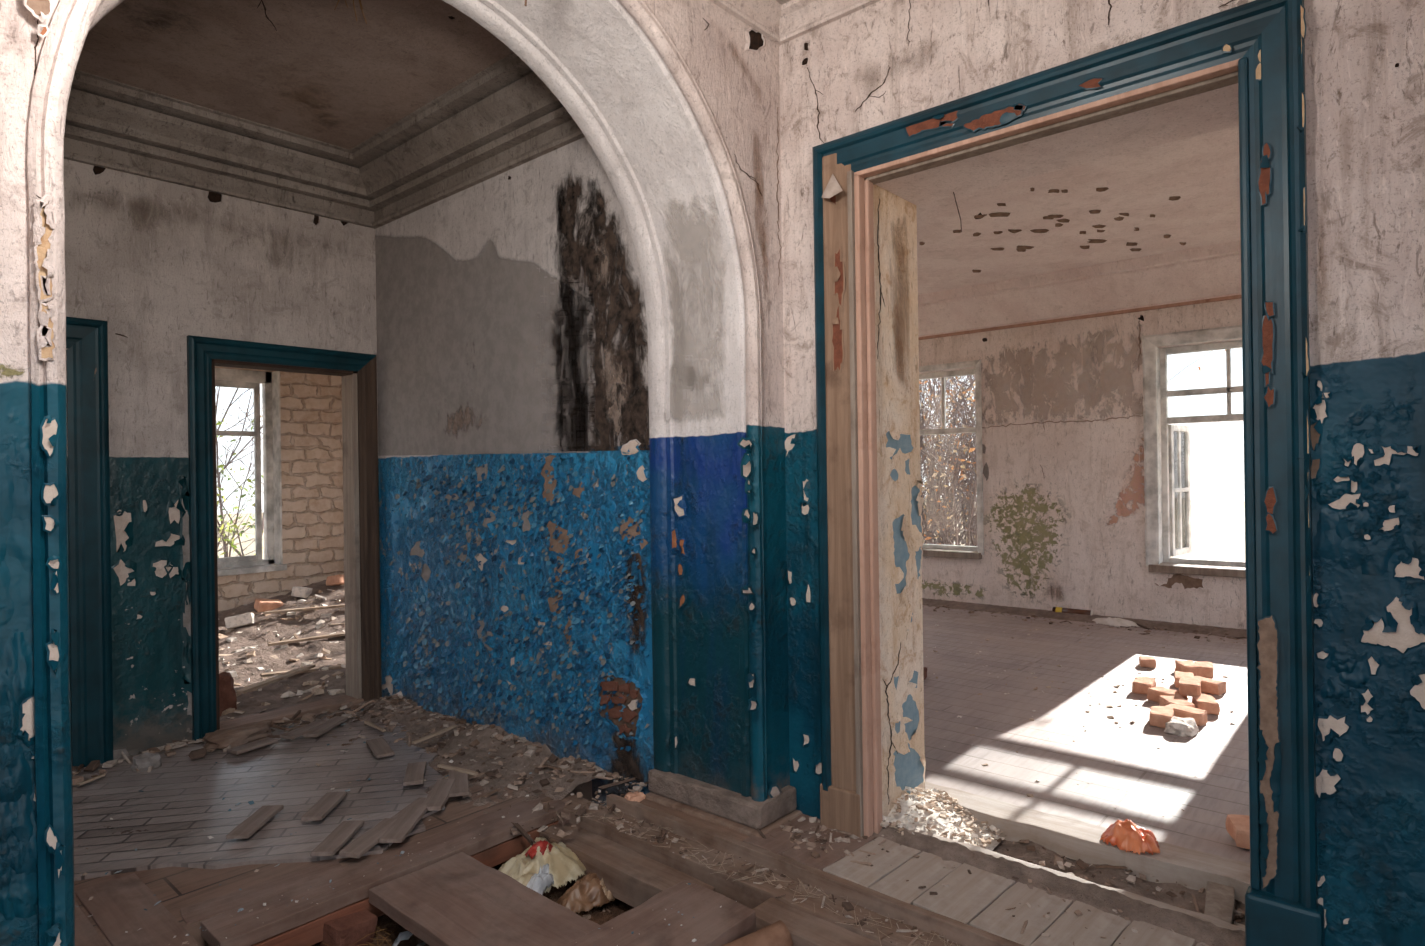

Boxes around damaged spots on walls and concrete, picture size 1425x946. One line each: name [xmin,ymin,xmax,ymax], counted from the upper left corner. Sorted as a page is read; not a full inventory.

crack [32,19,40,78]
peeling [953,203,1155,252]
peeling [14,695,35,761]
peeling [39,415,60,459]
peeling [41,482,61,534]
spalling [111,476,193,730]
water stain [375,236,635,456]
peeling [381,439,688,758]
peeling [885,431,925,622]
water stain [1000,504,1031,594]
peeling [1298,336,1421,542]
peeling [1315,555,1425,800]